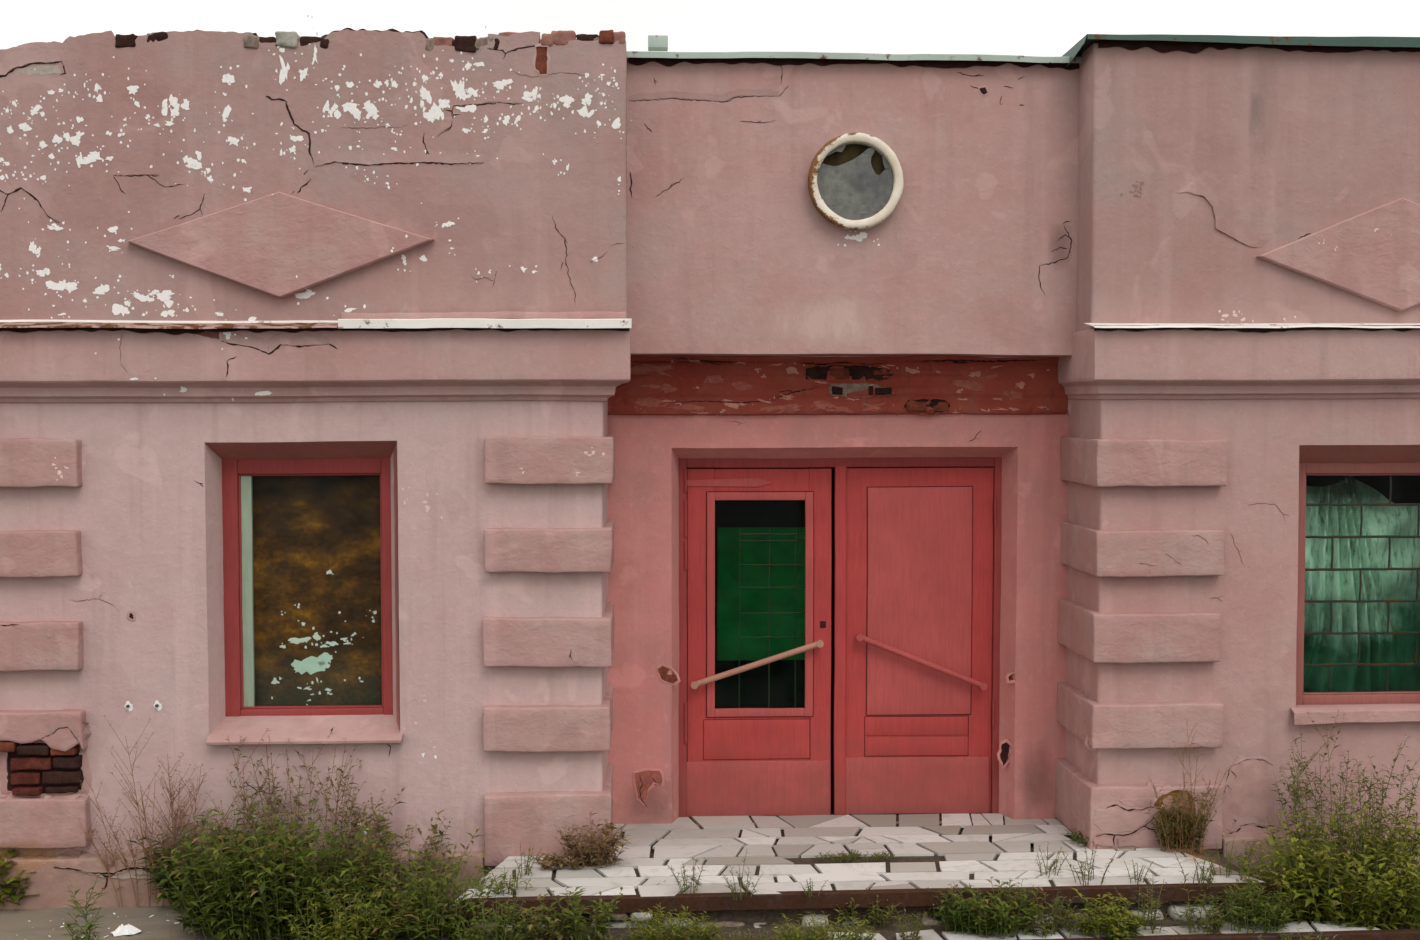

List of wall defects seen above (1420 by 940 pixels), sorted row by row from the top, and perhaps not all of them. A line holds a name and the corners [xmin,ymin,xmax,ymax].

crack [0,41,72,77]
peeling [0,65,256,201]
crack [266,31,587,193]
peeling [268,15,632,189]
crack [0,175,64,223]
peeling [0,198,196,319]
crack [552,216,622,303]
crack [1038,221,1072,295]
spalling [186,299,257,350]
crack [221,332,337,376]
peeling [616,359,1050,420]
flaking render [0,741,93,801]